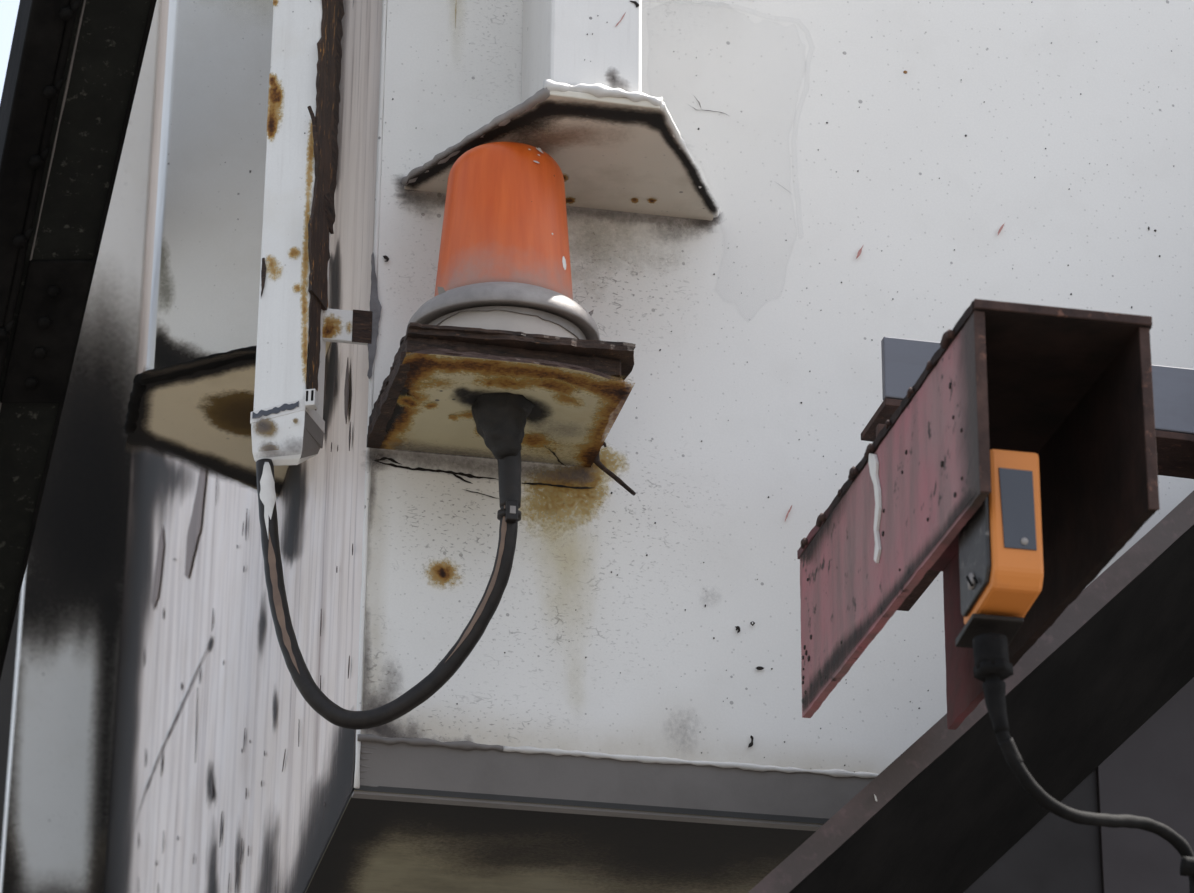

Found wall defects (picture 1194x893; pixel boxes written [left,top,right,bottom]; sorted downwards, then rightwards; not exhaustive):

corrosion [267,73,283,141]
corrosion [266,255,281,279]
corrosion [289,121,314,382]
corrosion [322,316,351,338]
corrosion [367,322,636,529]
crack [374,446,593,499]
corrosion [427,561,460,586]